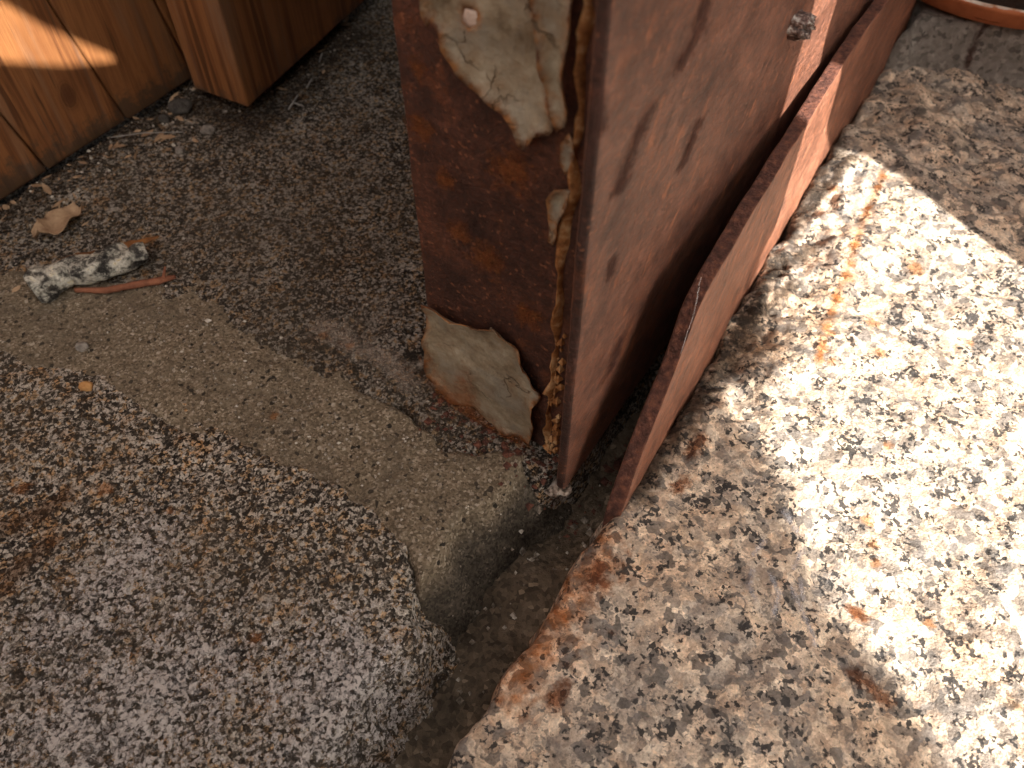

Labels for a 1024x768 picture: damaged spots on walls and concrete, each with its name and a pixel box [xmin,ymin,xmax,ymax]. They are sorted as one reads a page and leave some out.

peeling [419,0,575,174]
peeling [546,189,570,247]
corrosion [542,0,595,455]
peeling [420,305,541,446]
corrosion [683,433,710,459]
corrosion [668,475,692,494]
corrosion [581,561,612,594]
corrosion [547,679,574,712]